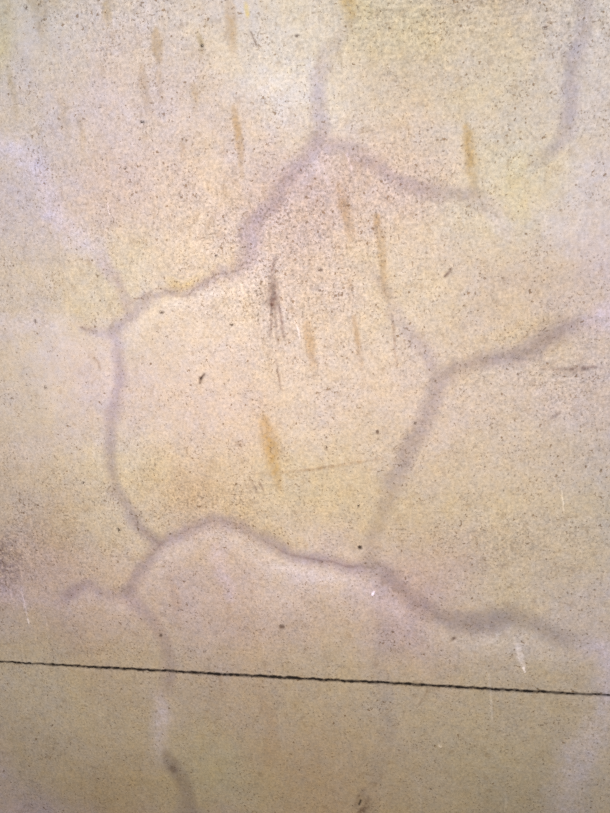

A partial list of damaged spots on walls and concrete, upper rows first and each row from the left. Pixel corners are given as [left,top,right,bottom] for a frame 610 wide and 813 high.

leakage [137,25,167,120]
leakage [230,103,246,183]
corrosion [460,122,480,195]
leakage [262,255,287,346]
leakage [372,212,391,304]
leakage [302,319,318,378]
crack [58,20,588,697]
leakage [539,364,604,378]
corrosion [257,412,285,494]
leakage [140,686,178,781]
crack [361,684,399,813]
leakage [538,622,610,813]